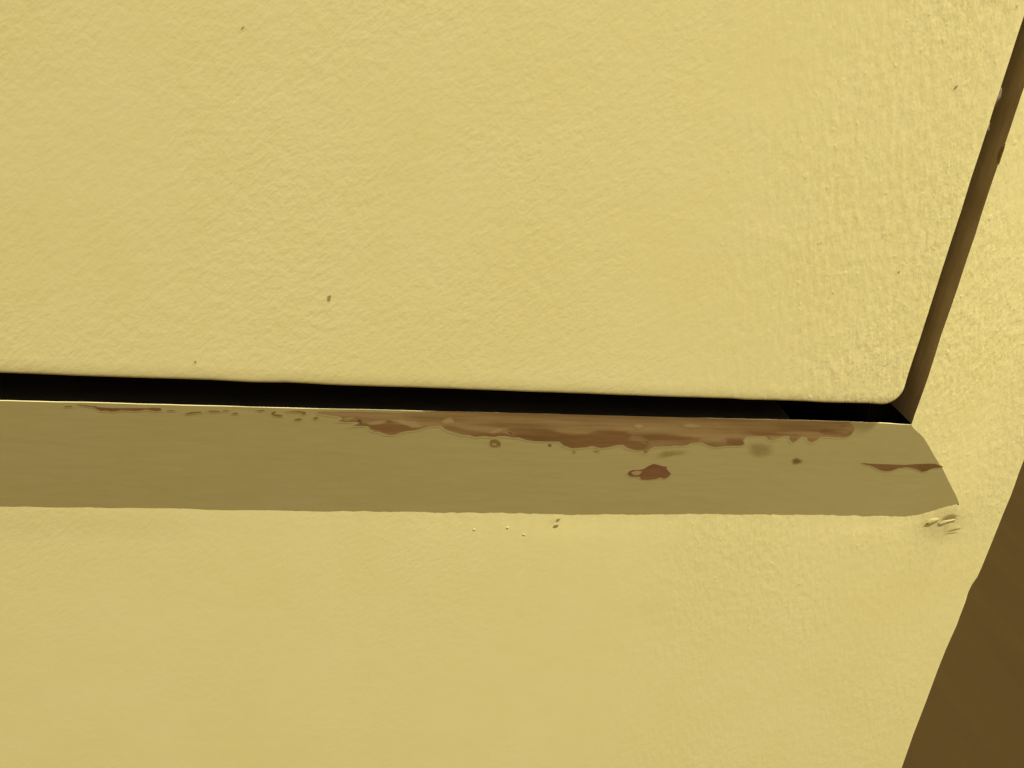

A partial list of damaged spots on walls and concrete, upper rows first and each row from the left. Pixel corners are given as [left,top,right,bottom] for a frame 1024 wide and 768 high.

peeling [314,410,857,480]
peeling [861,462,943,473]